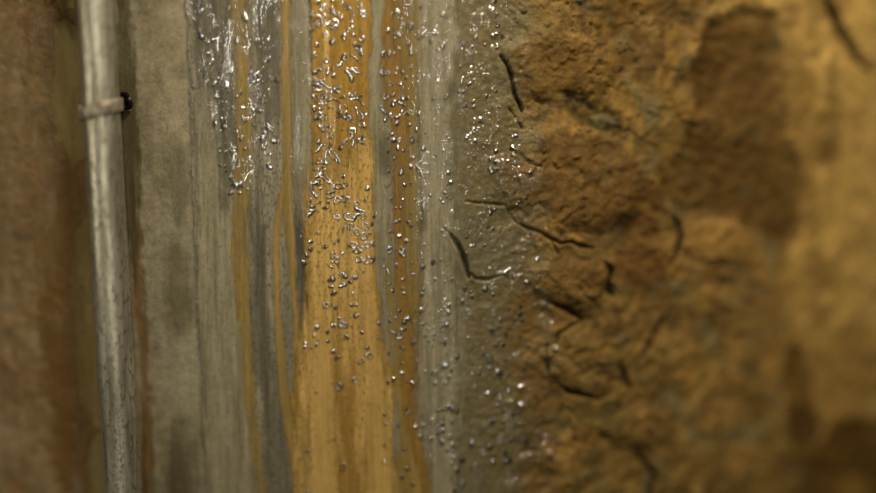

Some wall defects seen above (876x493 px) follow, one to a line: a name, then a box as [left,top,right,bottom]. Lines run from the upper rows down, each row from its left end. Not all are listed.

crack [824,0,873,74]
crack [500,56,522,129]
leakage [184,0,315,493]
rust [273,0,431,493]
leakage [367,0,550,493]
crack [456,241,501,281]
crack [478,202,614,296]
crack [670,217,682,264]
crack [545,301,667,411]
crack [636,449,677,493]